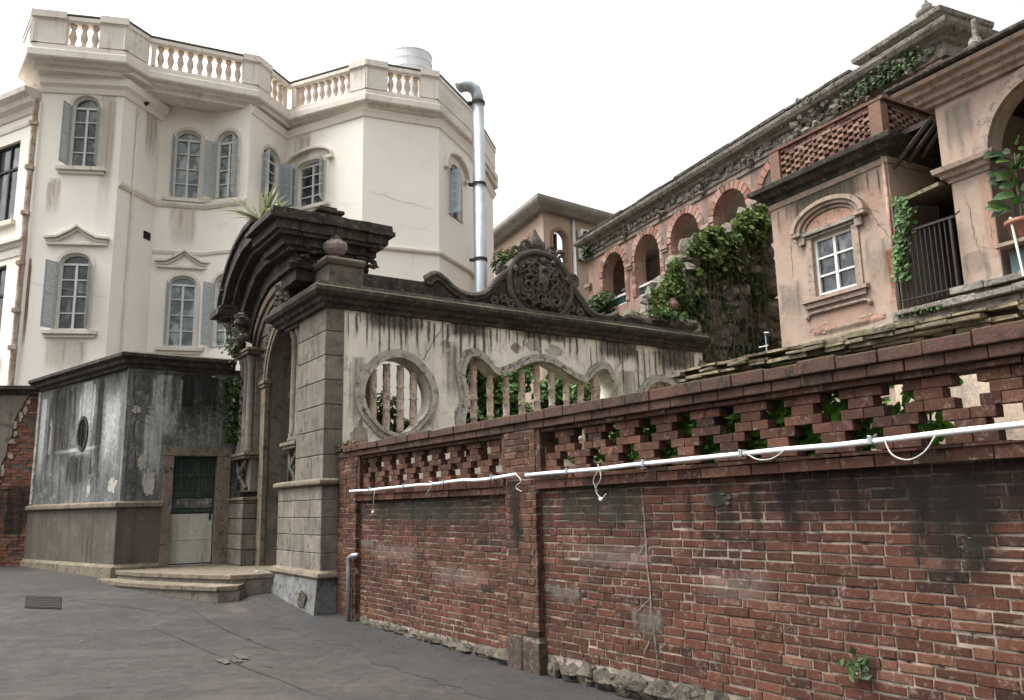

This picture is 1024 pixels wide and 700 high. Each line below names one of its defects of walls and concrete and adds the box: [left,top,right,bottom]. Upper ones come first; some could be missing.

damp [348,312,700,389]
peeling [0,375,183,497]